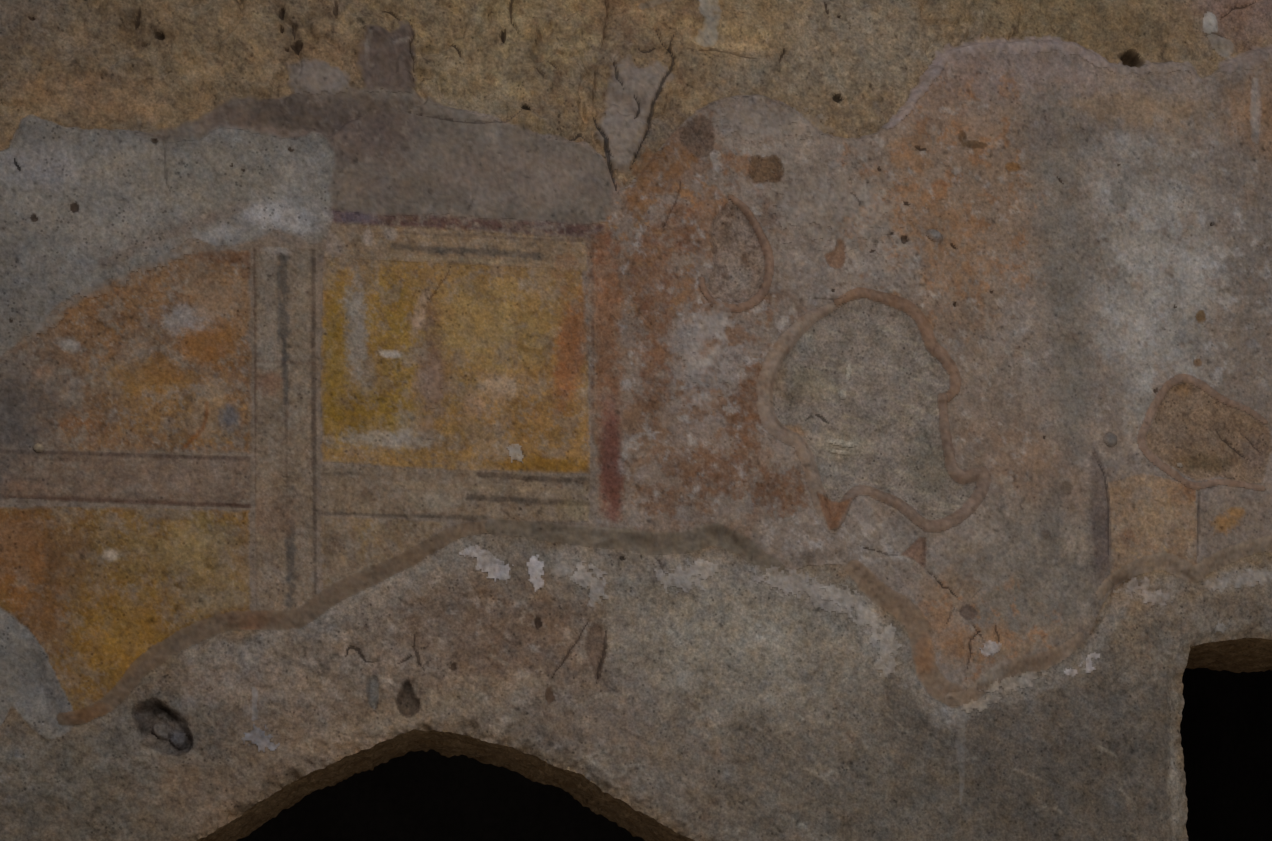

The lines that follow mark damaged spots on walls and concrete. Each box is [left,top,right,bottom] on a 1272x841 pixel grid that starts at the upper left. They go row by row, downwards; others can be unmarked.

spalling [128,0,176,53]
spalling [269,0,316,69]
crack [503,0,519,44]
crack [569,0,755,194]
flaking render [678,115,715,159]
flaking render [748,154,785,184]
flaking render [901,536,928,568]
crack [928,571,1000,680]
spalling [396,678,422,718]
spalling [113,698,193,769]